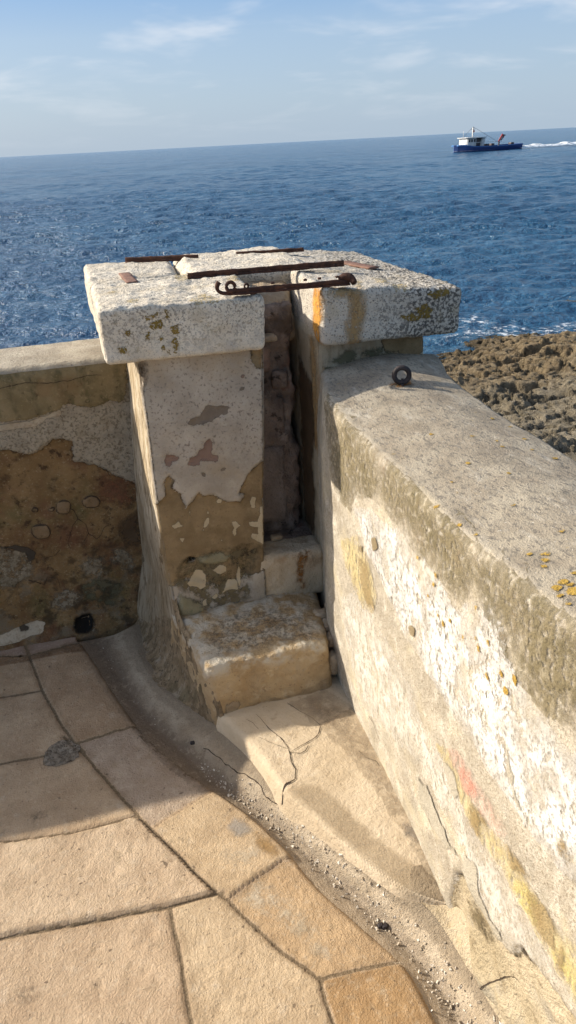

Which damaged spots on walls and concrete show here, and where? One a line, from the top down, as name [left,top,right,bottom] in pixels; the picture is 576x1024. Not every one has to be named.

corrosion [312,287,365,344]
peeling [188,405,229,426]
spalling [0,439,142,651]
peeling [150,439,265,606]
crack [203,703,321,805]